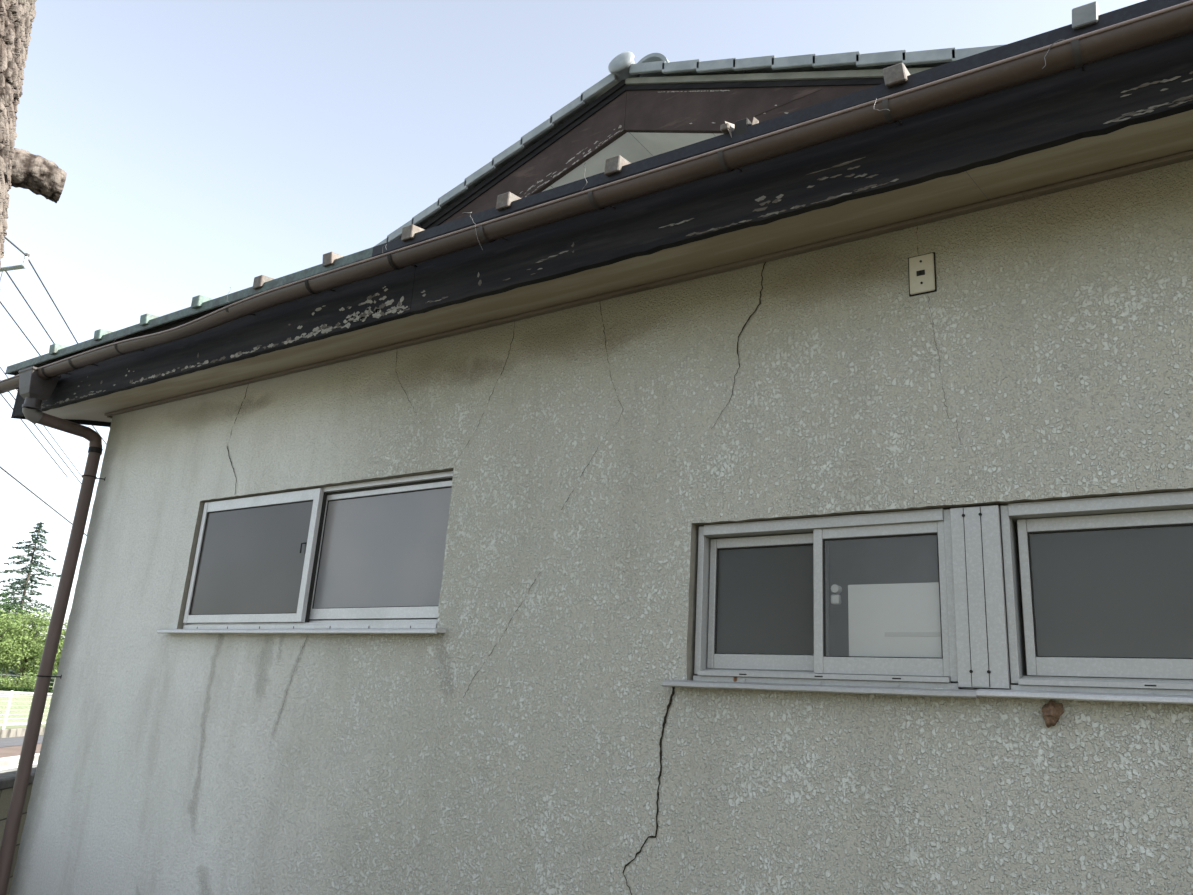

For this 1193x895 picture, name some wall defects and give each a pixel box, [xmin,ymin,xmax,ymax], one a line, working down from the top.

peeling [1103,71,1193,124]
peeling [42,286,410,408]
crack [711,262,766,429]
crack [623,687,675,895]